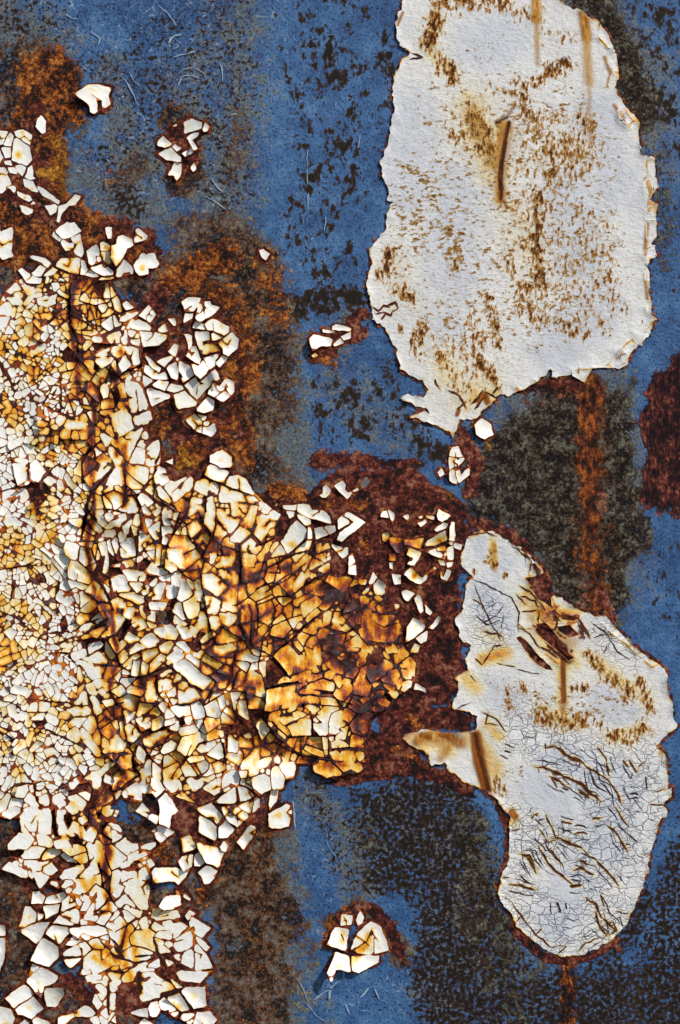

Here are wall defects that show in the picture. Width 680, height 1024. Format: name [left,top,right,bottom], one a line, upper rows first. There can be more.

peeling [157,118,209,181]
peeling [366,0,659,484]
crack [80,868,166,1011]
corrosion [128,522,197,582]
crack [0,272,380,842]
corrosion [147,487,243,593]
peeling [0,129,441,1024]
corrosion [193,639,297,770]
peeling [382,509,677,957]
crack [457,532,632,759]
crack [503,740,664,957]
corrosion [655,706,680,775]